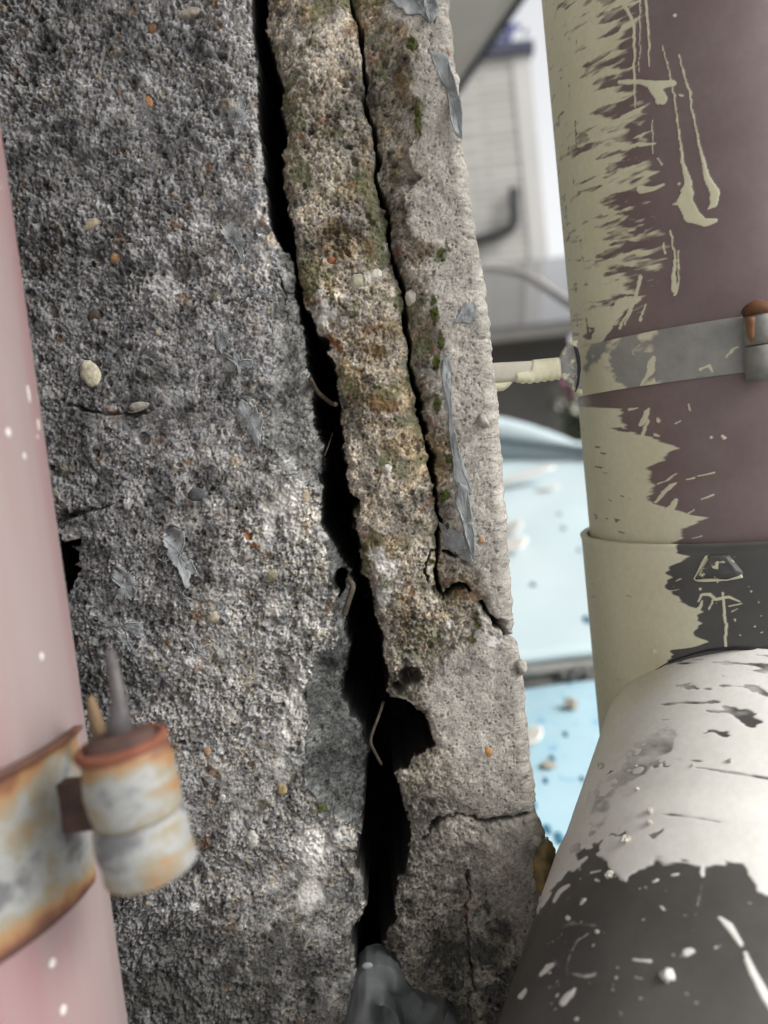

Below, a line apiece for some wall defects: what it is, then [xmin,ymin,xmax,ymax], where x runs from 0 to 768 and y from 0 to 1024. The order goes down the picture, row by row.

efflorescence [316,290,344,329]
leakage [362,337,390,359]
leakage [367,395,398,427]
crack [224,0,533,967]
efflorescence [261,471,308,543]
efflorescence [369,546,399,577]
leakage [265,594,285,618]
efflorescence [377,590,391,606]
efflorescence [482,636,502,647]
crack [464,869,477,1024]